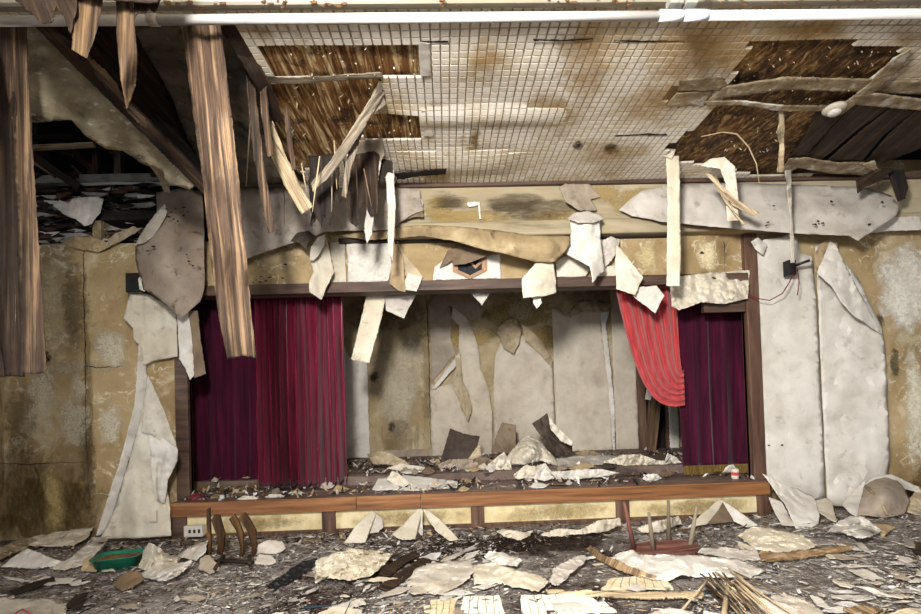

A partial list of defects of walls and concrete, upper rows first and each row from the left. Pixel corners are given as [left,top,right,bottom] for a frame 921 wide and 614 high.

peeling [258,43,421,173]
peeling [240,187,423,261]
peeling [619,185,668,222]
peeling [664,38,902,334]
water stain [878,247,921,337]
peeling [432,354,461,389]
peeling [600,311,615,450]
water stain [890,350,899,376]
water stain [0,450,94,536]